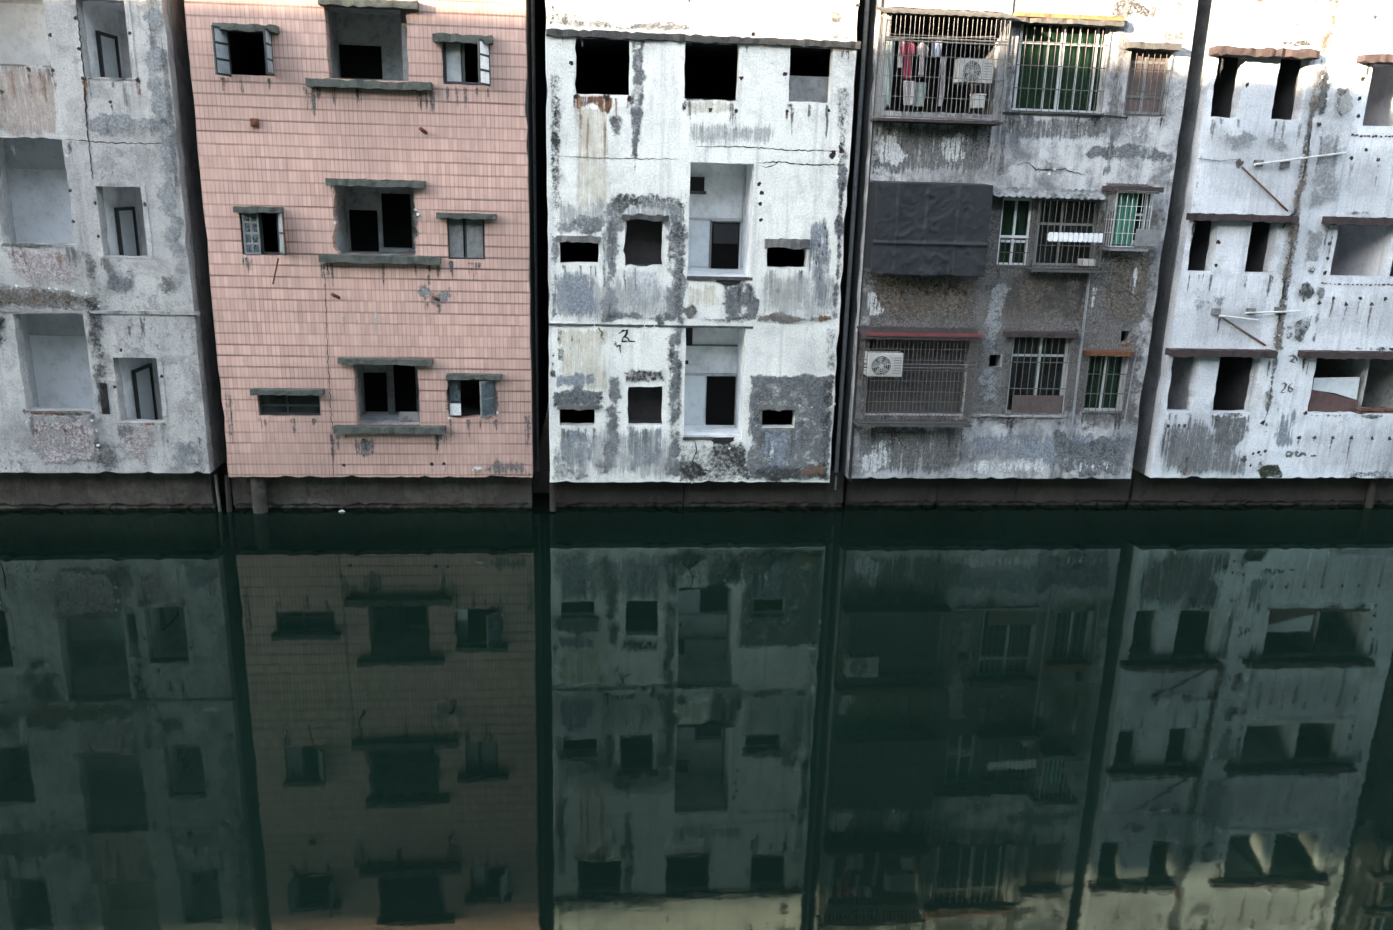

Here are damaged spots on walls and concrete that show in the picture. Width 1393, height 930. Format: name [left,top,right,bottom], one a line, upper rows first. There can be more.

water stain [0,246,202,469]
water stain [88,0,186,294]
rust [573,94,632,113]
water stain [550,5,694,168]
water stain [550,77,849,482]
water stain [1160,0,1347,478]